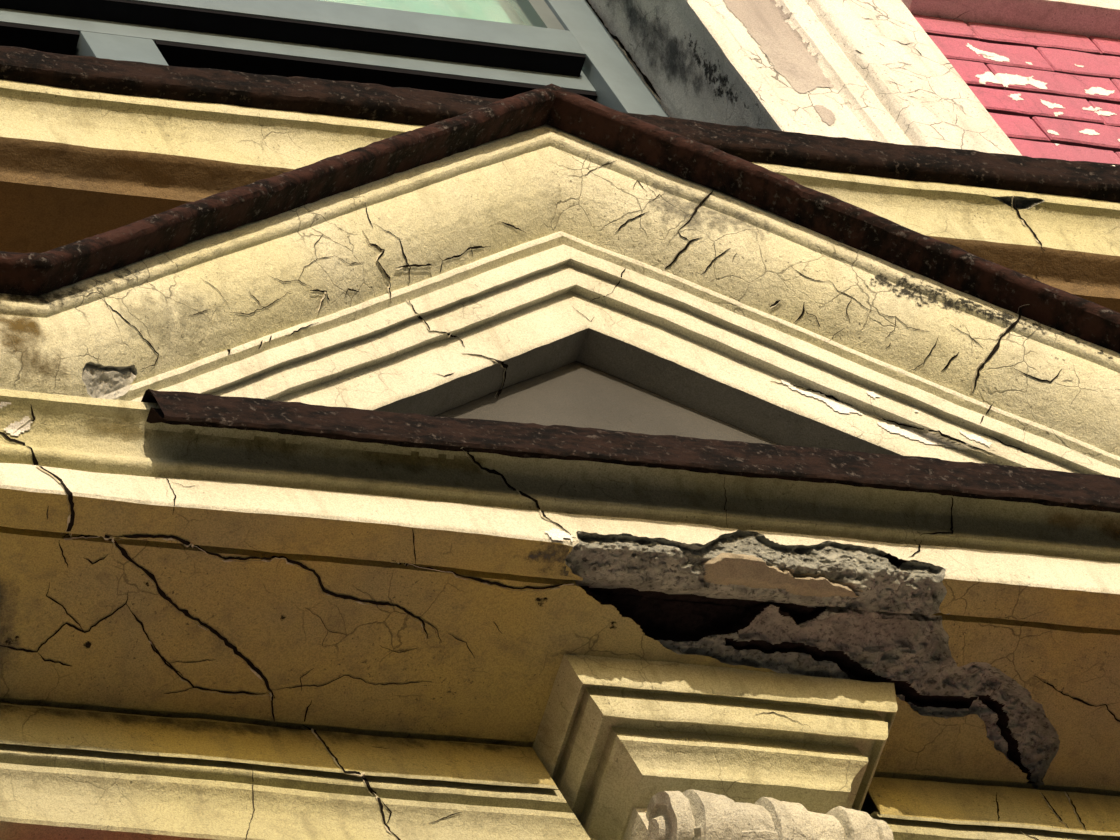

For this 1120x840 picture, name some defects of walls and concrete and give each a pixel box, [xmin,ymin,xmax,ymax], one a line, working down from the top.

water stain [623,0,745,107]
peeling [723,0,834,94]
peeling [966,43,1064,116]
peeling [1082,87,1117,116]
crack [661,189,737,275]
crack [1012,195,1045,252]
spalling [82,362,137,399]
crack [99,297,159,369]
crack [189,204,526,399]
crack [770,266,1072,456]
crack [0,406,475,840]
spalling [545,528,1060,789]